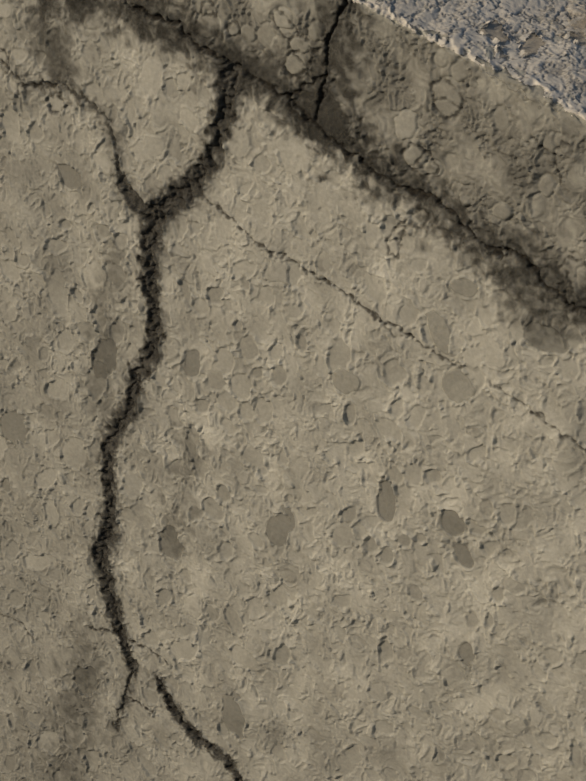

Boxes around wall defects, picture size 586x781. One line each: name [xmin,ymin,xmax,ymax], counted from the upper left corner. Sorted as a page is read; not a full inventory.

crack [91,0,412,781]
crack [397,184,586,311]